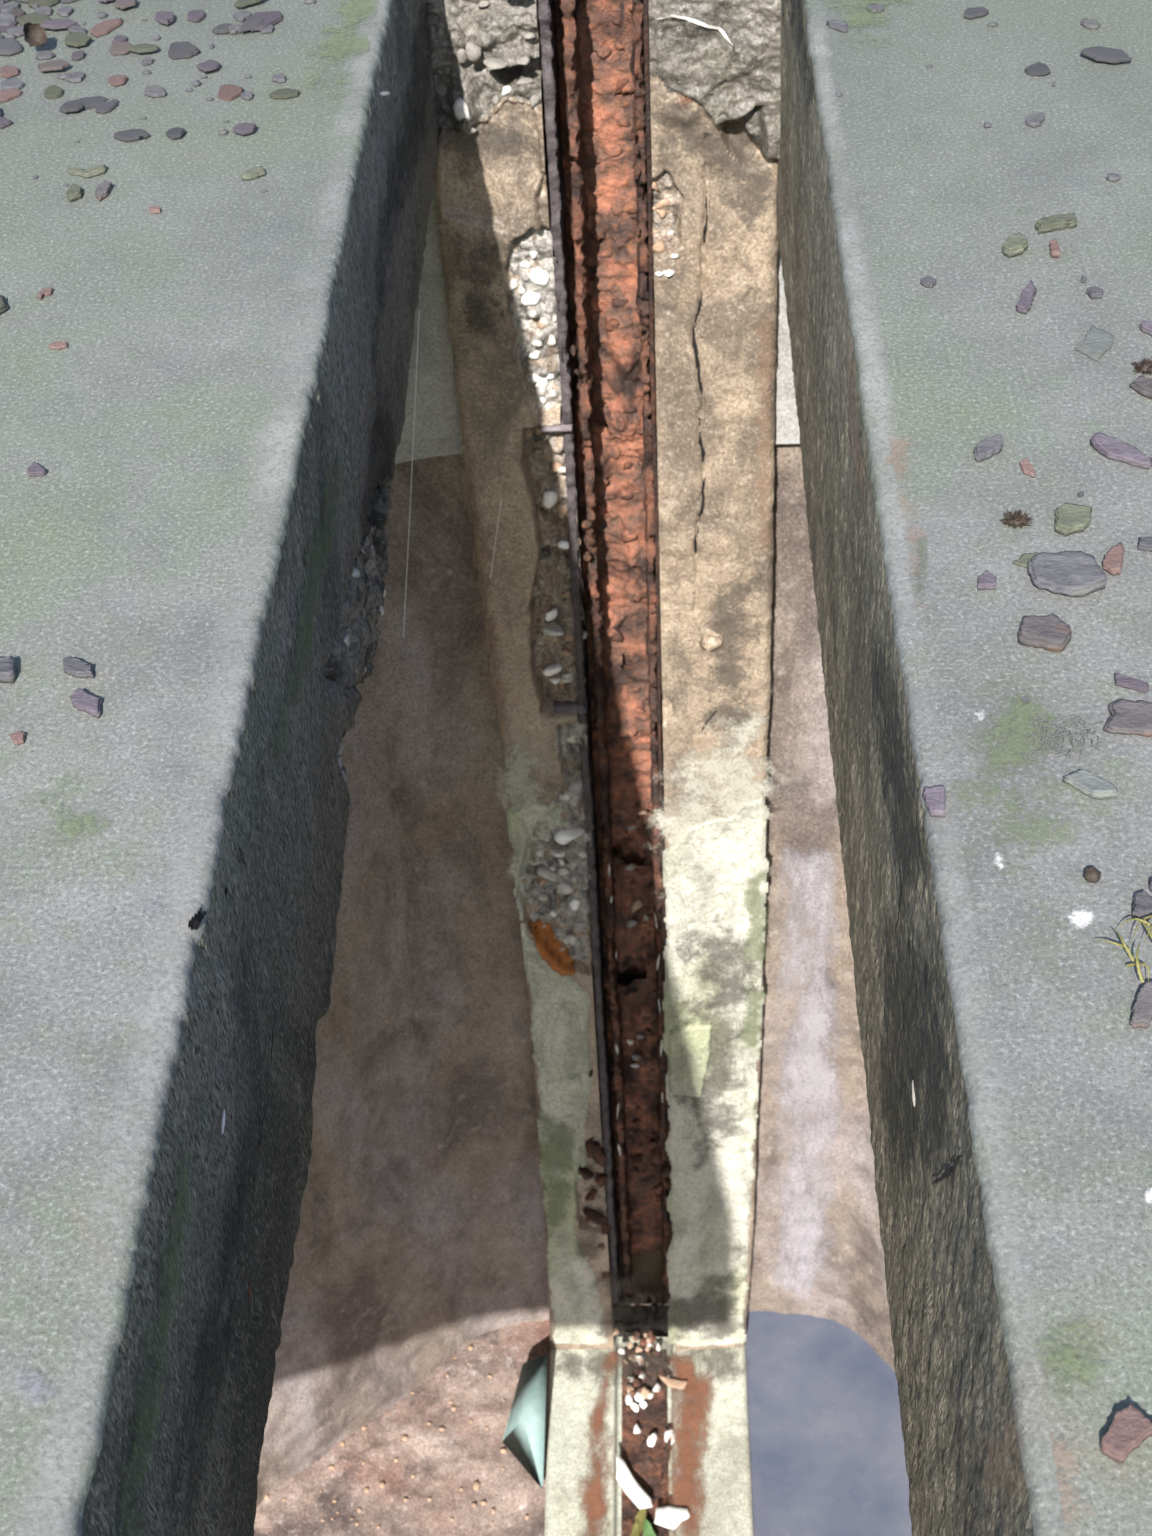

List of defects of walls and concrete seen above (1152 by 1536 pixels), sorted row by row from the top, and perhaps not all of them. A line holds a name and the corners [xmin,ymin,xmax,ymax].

flaking render [652,9,735,105]
crack [702,172,710,243]
crack [692,292,706,554]
spalling [322,523,389,691]
rust [528,919,575,976]
leakage [657,938,752,1168]
leakage [558,1271,745,1383]
rust [581,1353,618,1536]